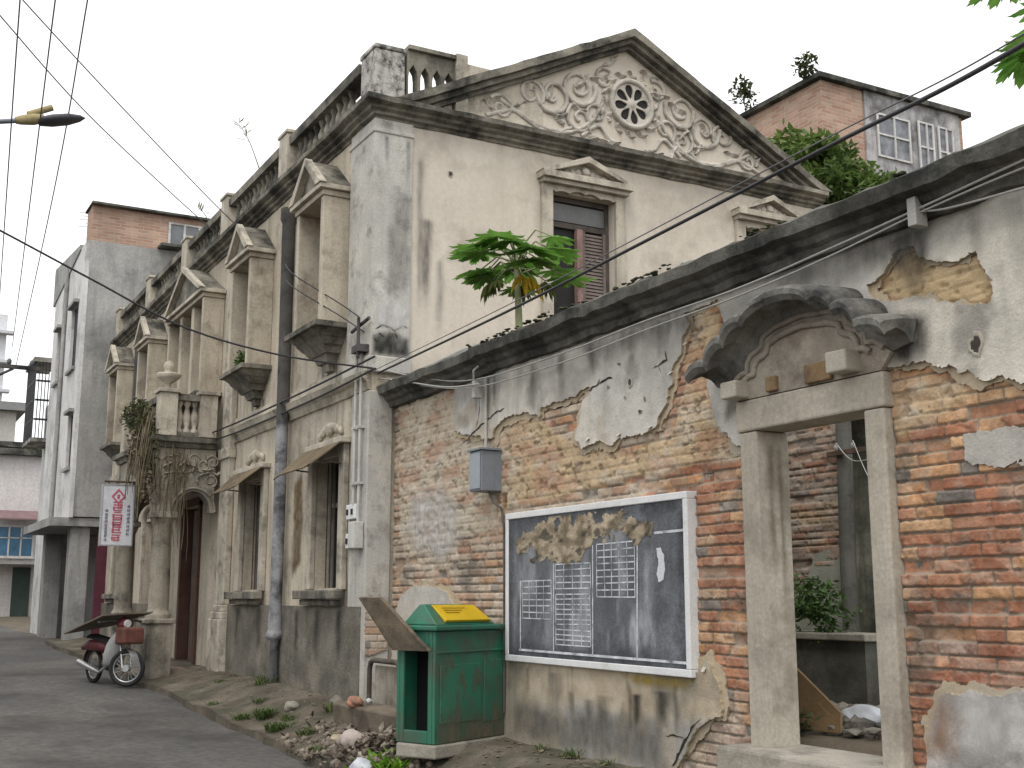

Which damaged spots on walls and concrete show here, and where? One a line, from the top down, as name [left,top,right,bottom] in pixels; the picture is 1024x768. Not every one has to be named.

flaking render [879,251,993,304]
damp [374,300,408,355]
flaking render [967,330,984,358]
flaking render [392,306,751,768]
flaking render [889,362,1024,768]
crack [667,720,699,766]